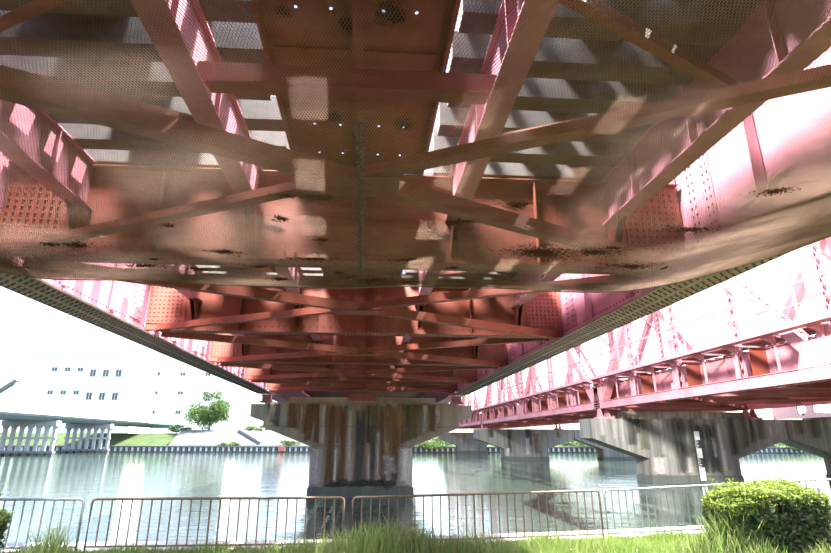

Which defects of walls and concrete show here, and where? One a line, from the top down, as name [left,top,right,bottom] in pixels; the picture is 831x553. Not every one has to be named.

corrosion [288,404,347,482]
leakage [348,406,379,482]
corrosion [379,405,400,483]
leakage [400,405,426,485]
leakage [654,421,666,474]
leakage [674,417,778,473]